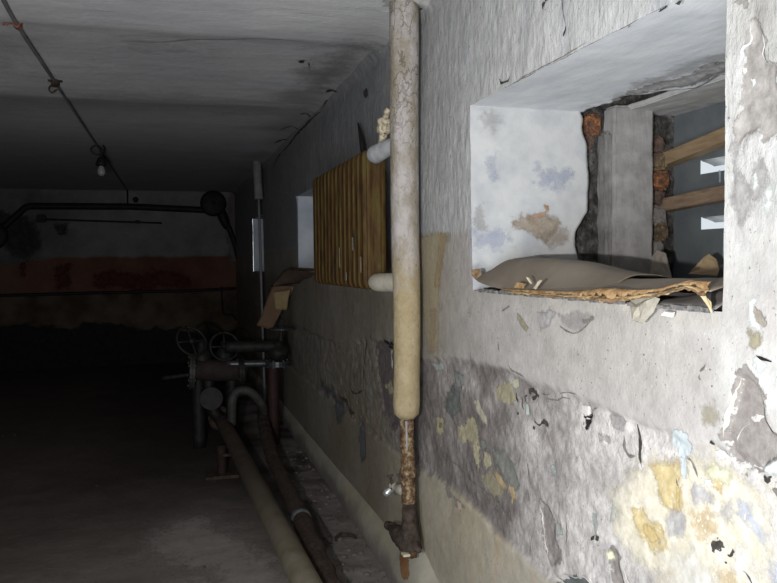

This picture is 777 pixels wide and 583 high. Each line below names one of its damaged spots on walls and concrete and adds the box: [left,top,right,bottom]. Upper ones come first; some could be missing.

spalling [732,18,777,145]
spalling [376,339,400,431]
peeling [457,399,516,504]
peeling [495,378,548,430]
spalling [582,405,597,430]
peeling [606,356,777,583]
rust [399,551,409,579]
spalling [526,490,567,567]
spalling [552,574,590,583]